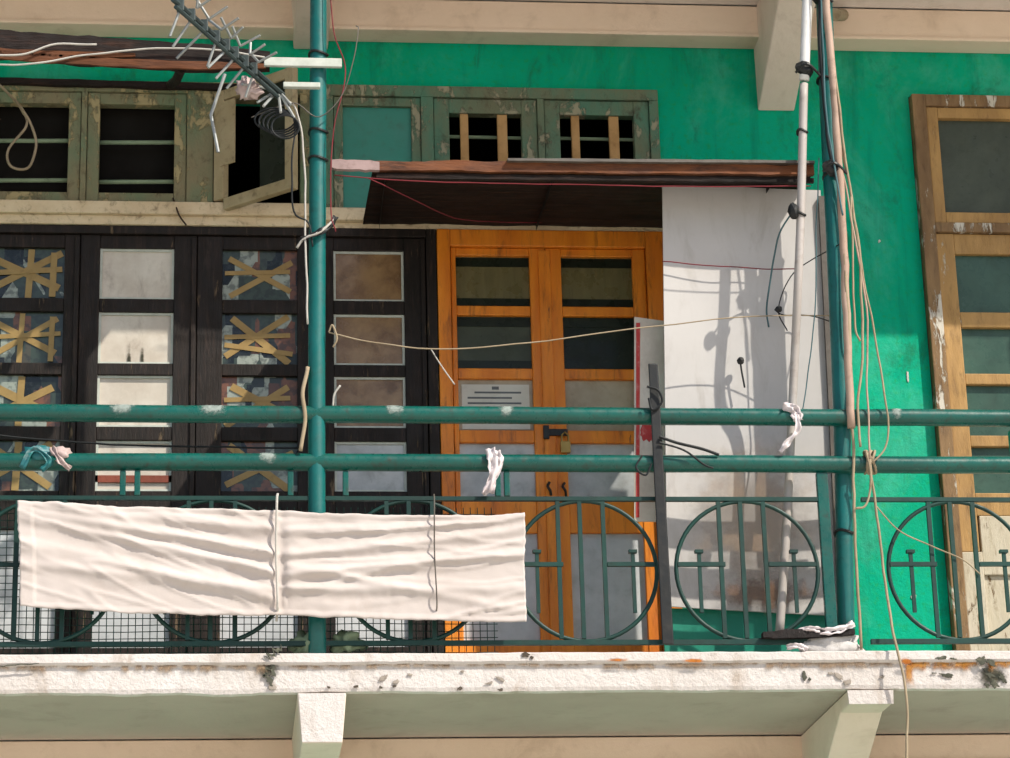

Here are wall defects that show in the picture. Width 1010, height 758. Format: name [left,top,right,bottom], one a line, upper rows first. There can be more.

corrosion [902,659,912,682]